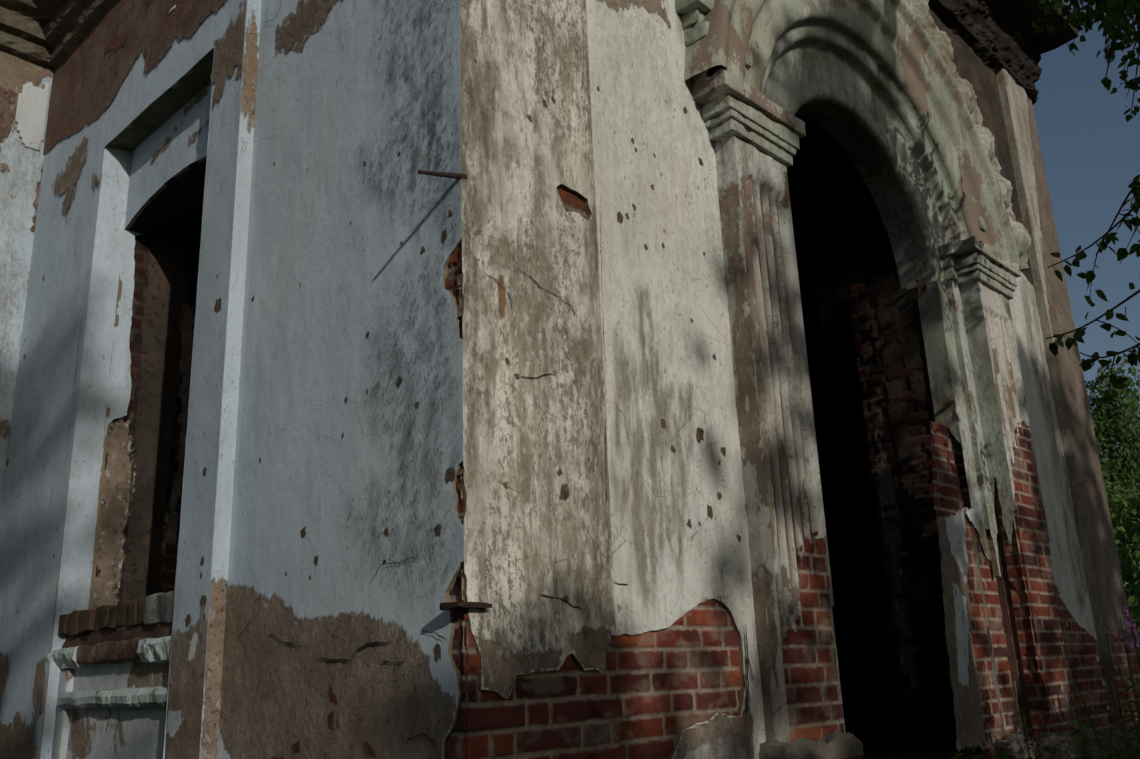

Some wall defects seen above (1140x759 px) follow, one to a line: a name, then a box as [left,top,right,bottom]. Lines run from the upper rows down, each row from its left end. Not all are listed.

flaking render [0,0,226,232]
flaking render [149,0,259,165]
flaking render [275,0,343,56]
damp [366,0,456,239]
flaking render [929,7,1023,224]
damp [370,261,453,467]
flaking render [127,174,845,759]
flaking render [930,96,1140,759]
flaking render [0,652,45,759]